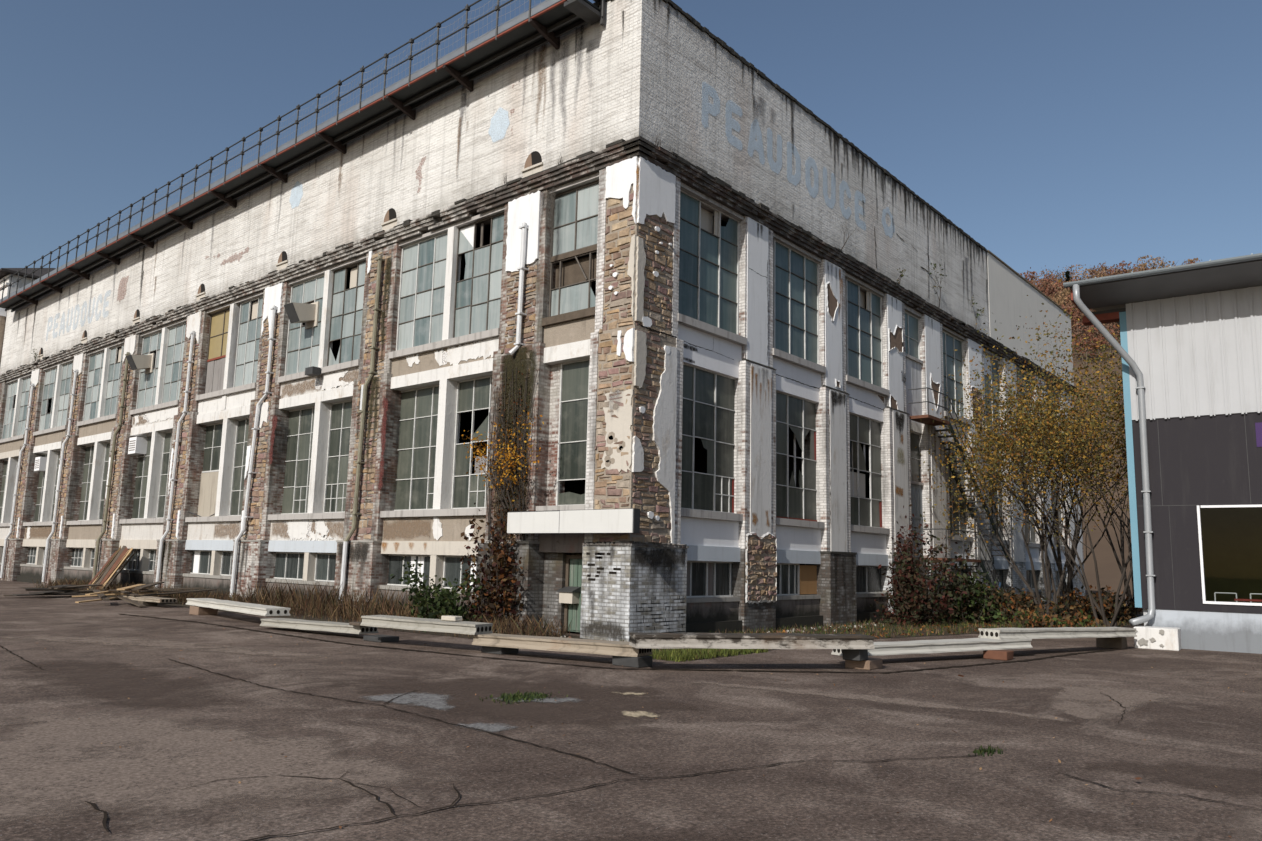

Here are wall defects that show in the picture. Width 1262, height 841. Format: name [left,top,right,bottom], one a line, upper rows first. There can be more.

water stain [524,25,584,111]
water stain [825,126,988,305]
flaking render [214,249,443,541]
flaking render [435,191,541,541]
flaking render [586,156,678,581]
flaking render [825,281,838,322]
flaking render [888,324,903,354]
flaking render [745,532,777,604]
crack [123,614,1127,673]
crack [169,659,982,841]
crack [85,801,134,832]